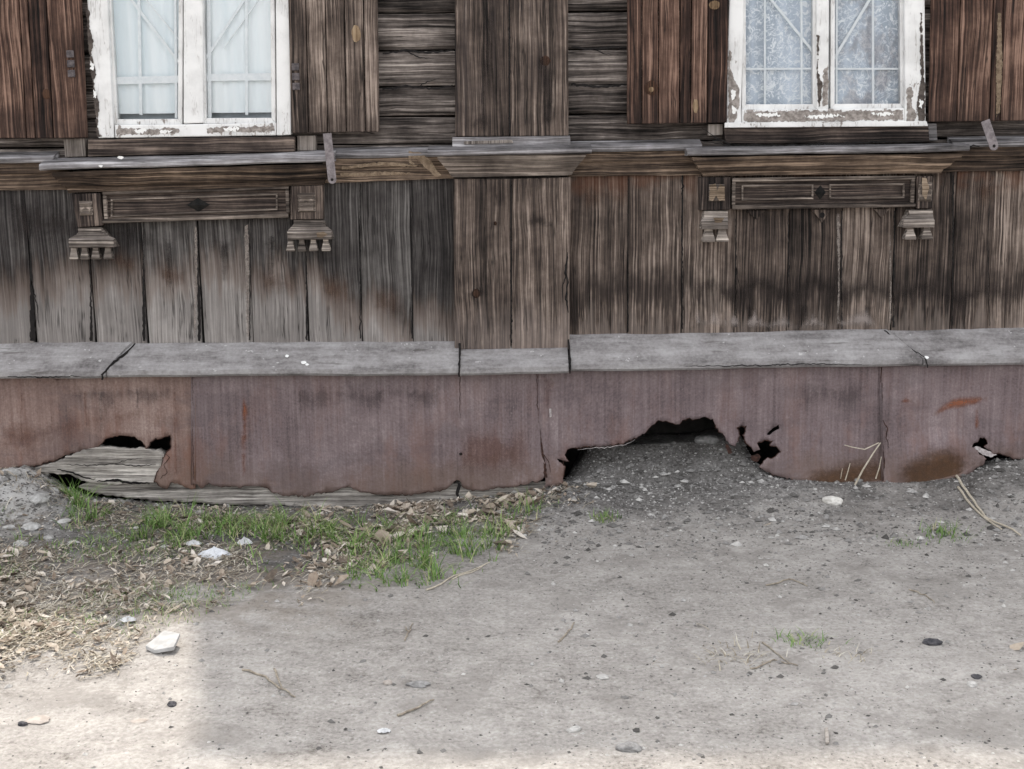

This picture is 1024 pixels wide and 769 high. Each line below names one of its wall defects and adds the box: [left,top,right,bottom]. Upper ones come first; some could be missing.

peeling [728,13,926,123]
crack [8,204,146,380]
crack [884,211,928,368]
crack [536,374,551,478]